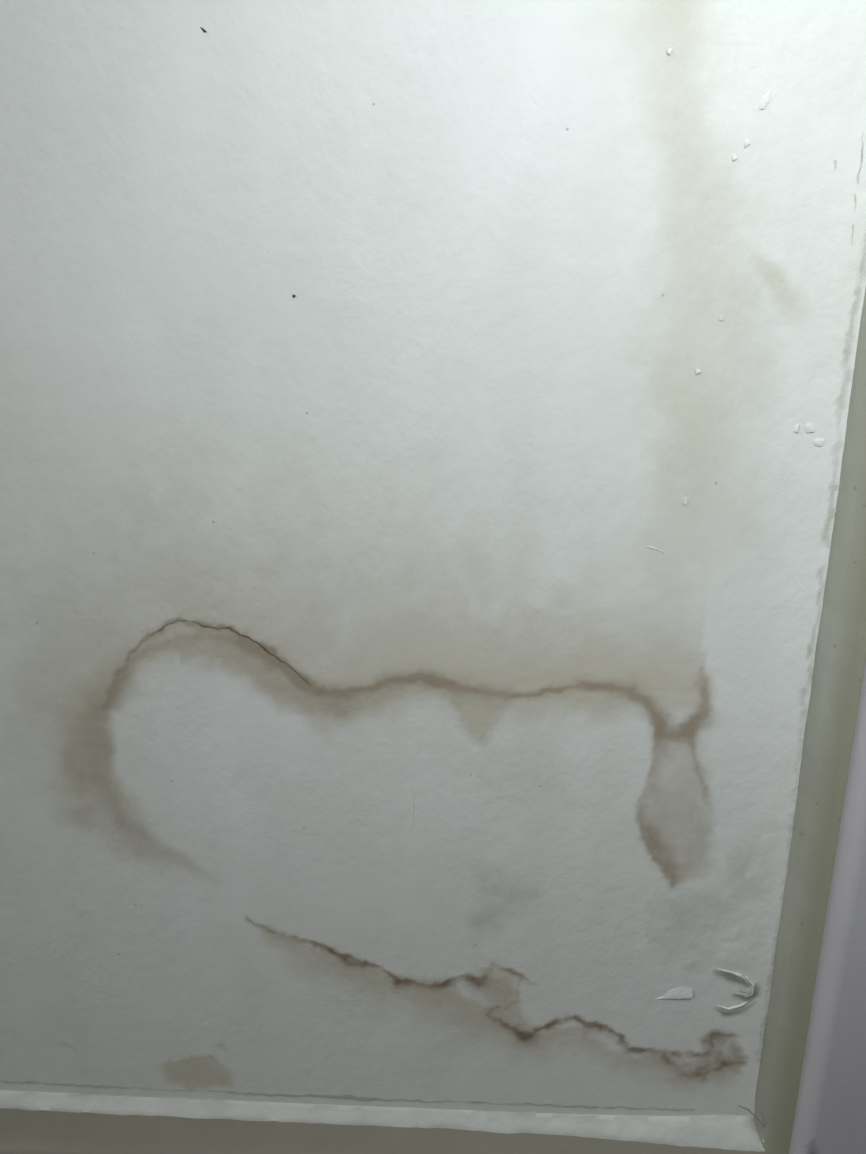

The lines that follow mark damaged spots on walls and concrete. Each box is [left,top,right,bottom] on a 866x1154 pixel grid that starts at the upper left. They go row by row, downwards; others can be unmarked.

leakage [130,619,708,750]
leakage [304,940,679,1064]
leakage [694,1031,744,1076]
peeling [718,969,758,1015]